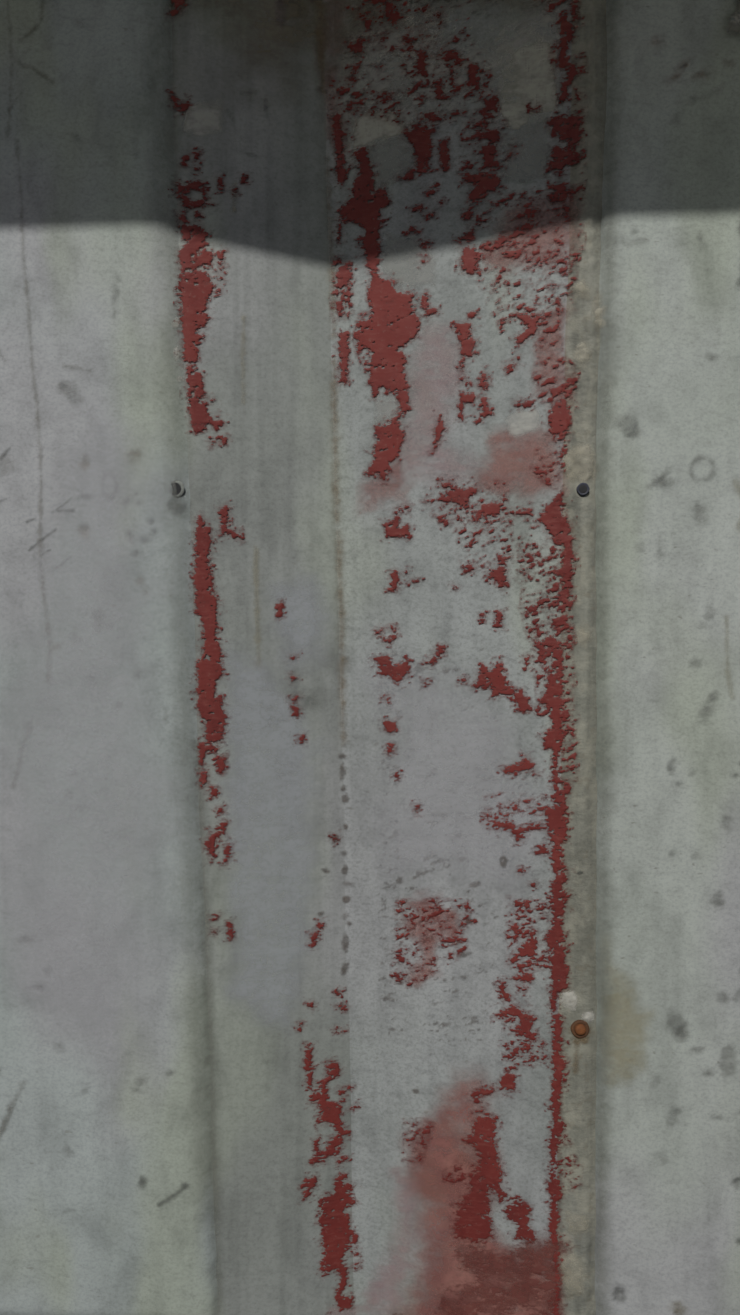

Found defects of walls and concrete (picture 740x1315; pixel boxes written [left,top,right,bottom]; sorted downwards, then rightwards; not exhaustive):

peeling [168,147,249,447]
peeling [189,500,245,866]
peeling [274,599,287,617]
peeling [284,653,303,719]
peeling [327,0,588,1315]
peeling [209,914,236,941]
peeling [306,913,324,948]
peeling [294,1022,362,1313]